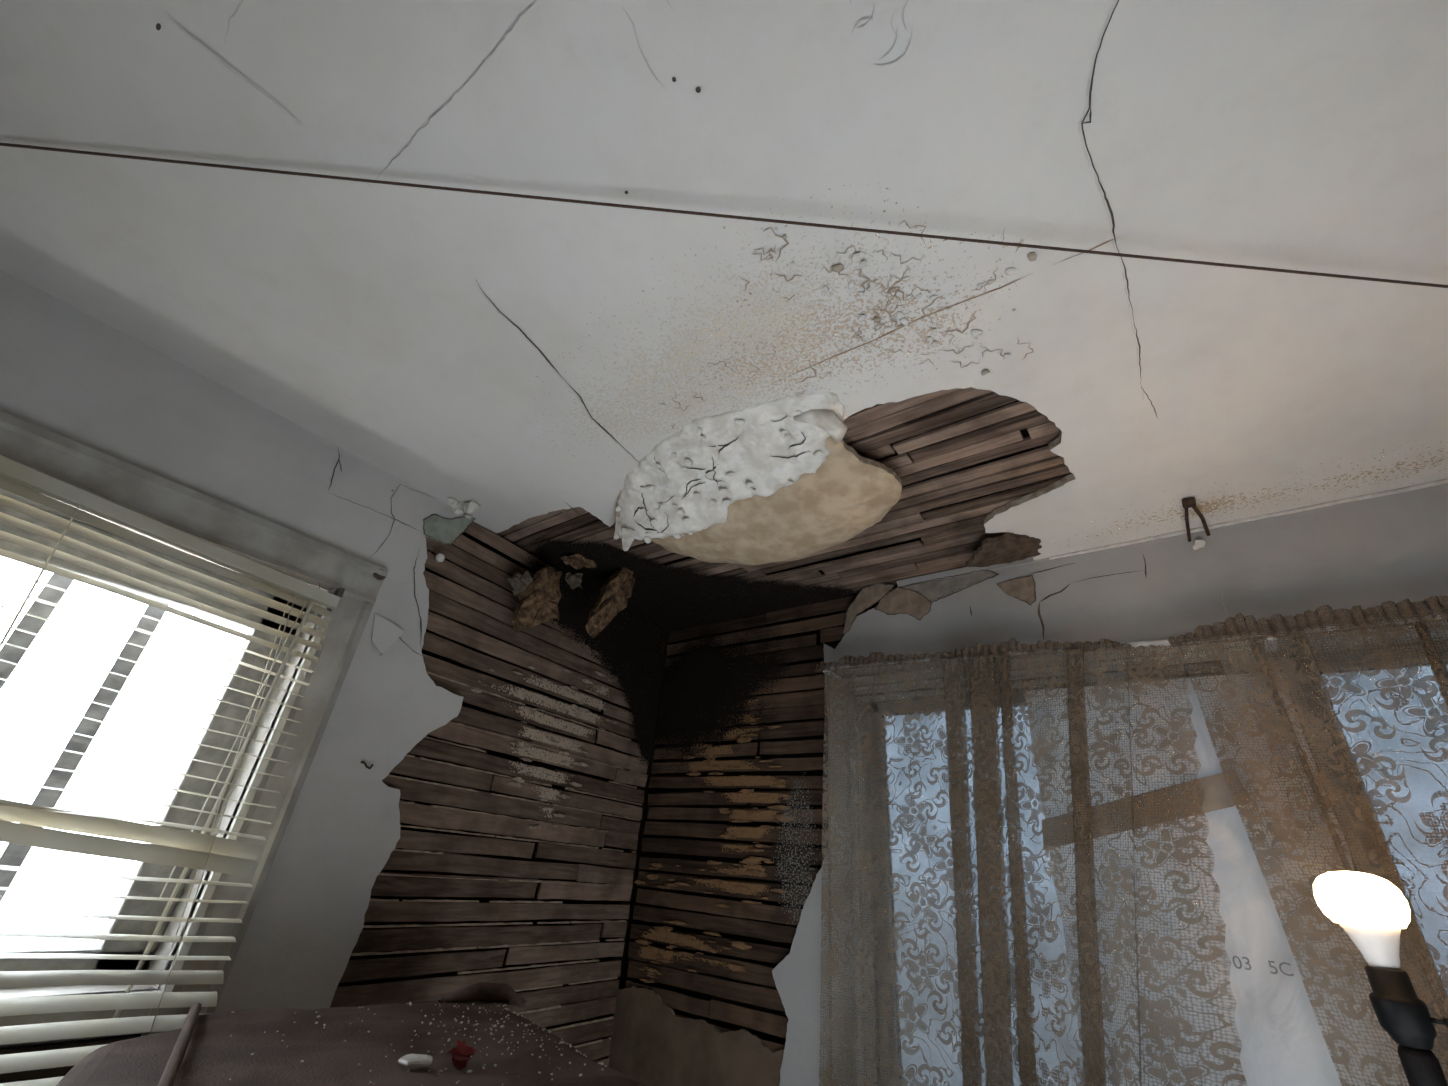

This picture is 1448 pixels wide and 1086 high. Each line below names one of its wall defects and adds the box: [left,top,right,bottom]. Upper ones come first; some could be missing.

crack [356,0,537,187]
crack [473,279,640,464]
water stain [537,195,998,461]
crack [770,0,1158,418]
water stain [1087,446,1448,541]
flaking render [330,220,1071,1086]